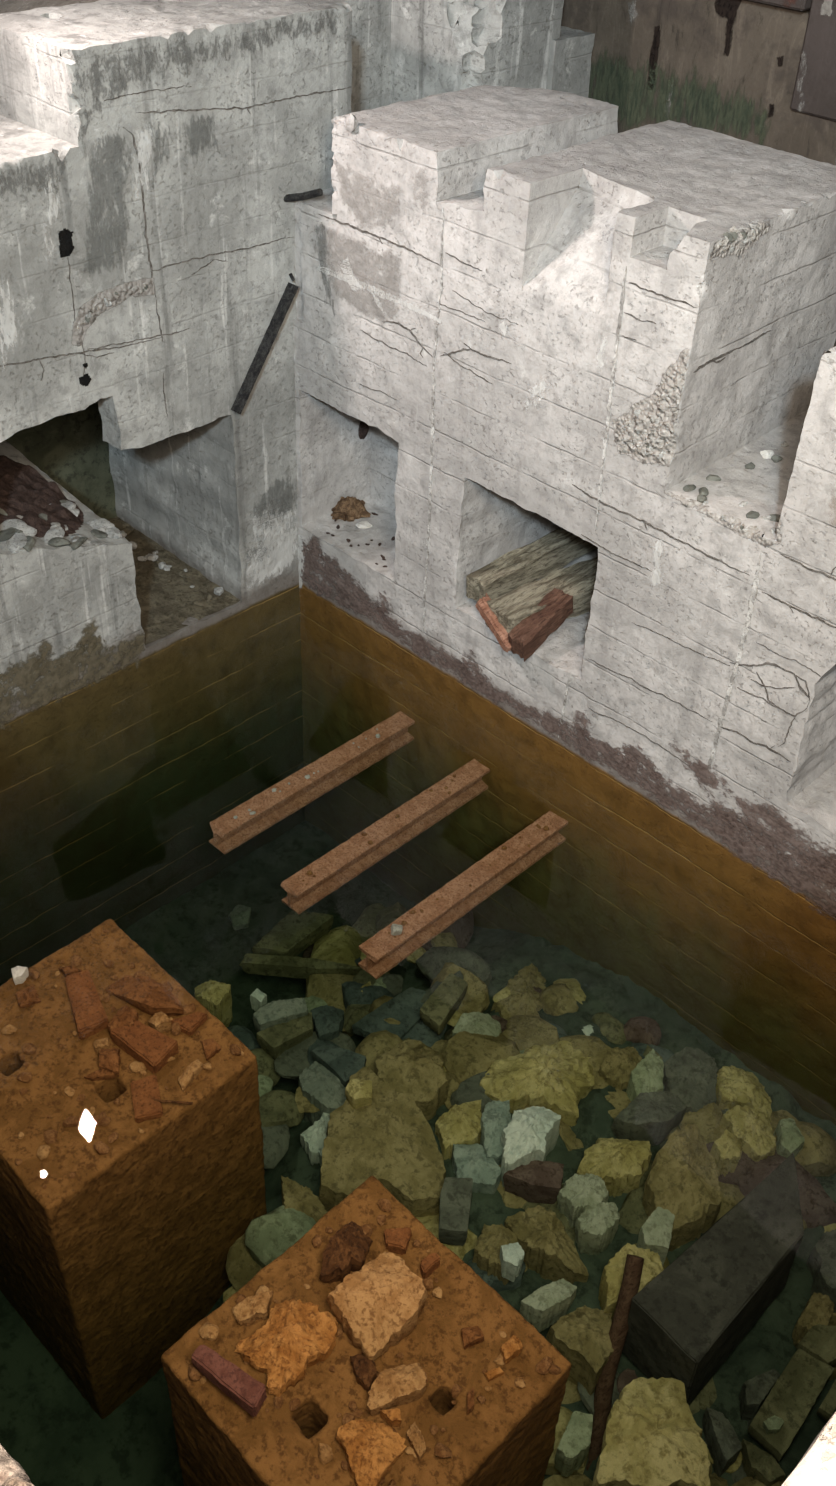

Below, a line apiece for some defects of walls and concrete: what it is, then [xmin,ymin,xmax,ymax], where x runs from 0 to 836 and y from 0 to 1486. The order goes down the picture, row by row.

spalling [72,277,155,387]
spalling [613,349,690,467]
crack [572,484,836,628]
leakage [246,511,836,919]
crack [588,623,821,765]